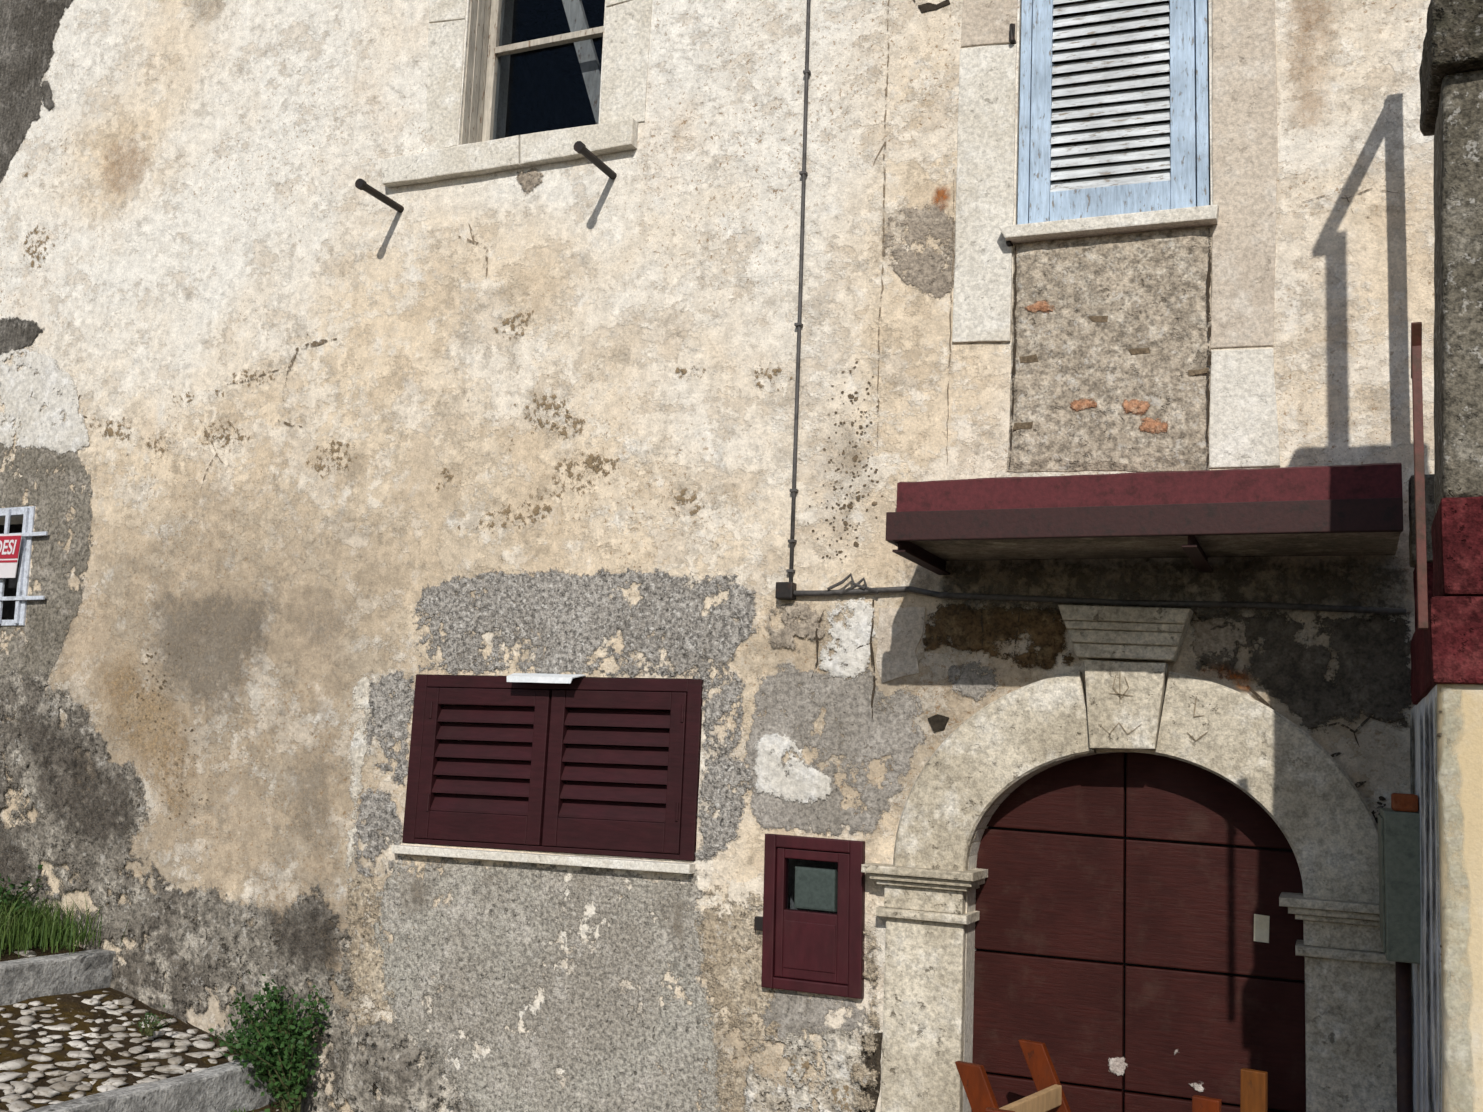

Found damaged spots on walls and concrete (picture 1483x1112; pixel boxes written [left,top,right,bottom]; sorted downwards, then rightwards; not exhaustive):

flaking render [0,0,73,182]
spalling [21,225,55,270]
spalling [0,317,44,355]
spalling [90,417,171,457]
spalling [199,419,249,450]
flaking render [0,442,93,683]
damp [18,710,133,841]
flaking render [743,601,1080,836]
damp [270,909,338,966]
damp [1420,703,1436,1112]